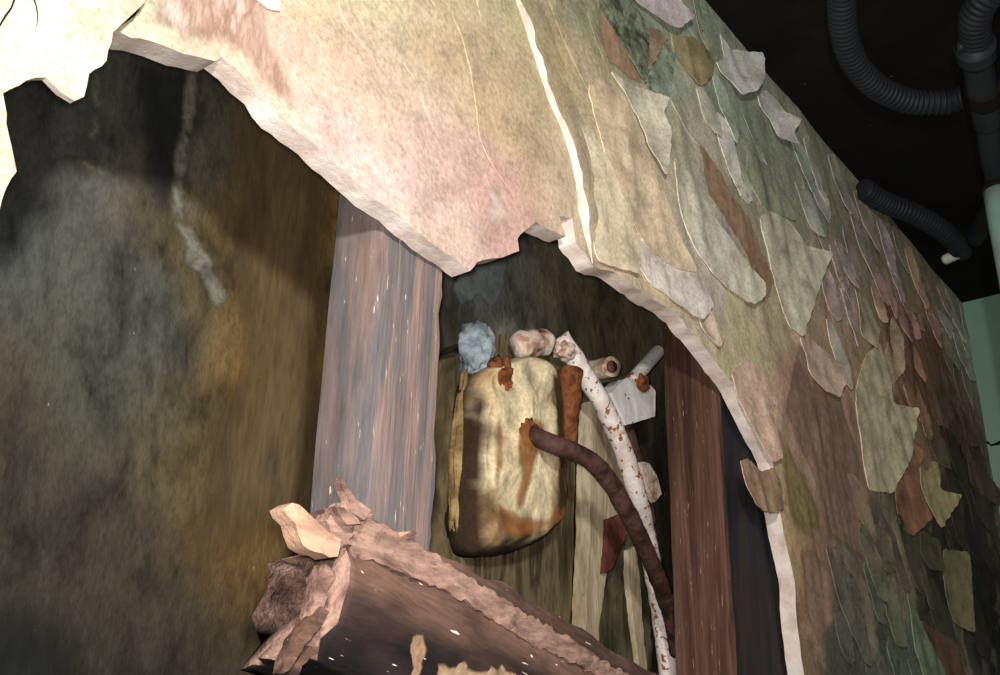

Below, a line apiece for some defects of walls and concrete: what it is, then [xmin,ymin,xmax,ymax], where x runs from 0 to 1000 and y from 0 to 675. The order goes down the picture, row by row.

crack [0,0,38,26]
crack [118,7,141,28]
damp [141,68,226,306]
peeling [577,0,1000,675]
rust [553,375,564,438]
rust [499,420,566,536]
rust [638,462,662,503]
peeling [411,635,426,675]
peeling [438,662,516,675]